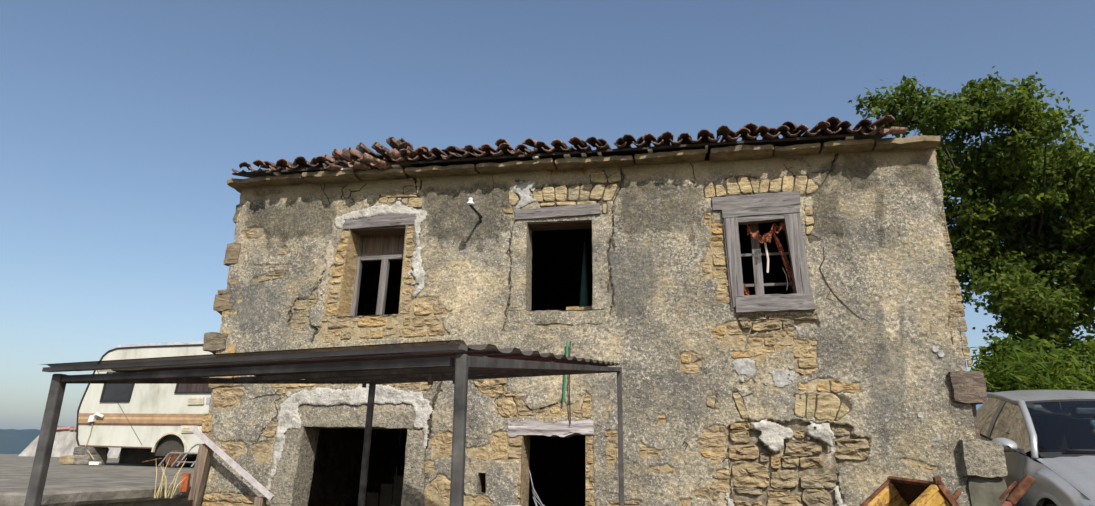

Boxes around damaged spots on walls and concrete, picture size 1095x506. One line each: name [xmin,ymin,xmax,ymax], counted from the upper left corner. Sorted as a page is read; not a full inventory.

crack [287,270,325,343]
crack [321,183,367,206]
spalling [289,165,451,343]
crack [502,222,515,330]
crack [607,169,624,315]
spalling [701,212,731,304]
spalling [703,175,820,243]
peeling [201,376,452,506]
spalling [464,431,524,506]
spalling [473,378,592,419]
spalling [585,402,618,506]
spalling [679,315,870,506]